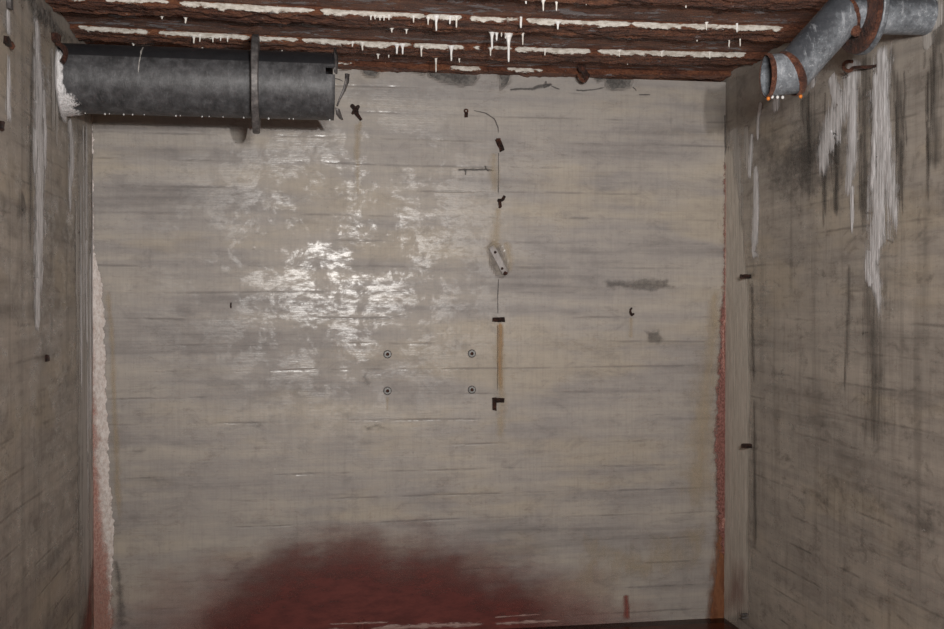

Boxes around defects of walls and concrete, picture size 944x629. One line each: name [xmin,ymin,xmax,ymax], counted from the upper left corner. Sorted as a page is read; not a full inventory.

water stain [78,25,480,51]
water stain [106,0,783,32]
water stain [493,46,746,58]
water stain [923,0,942,50]
water stain [800,60,859,233]
water stain [865,47,898,309]
water stain [33,13,115,629]
rust [709,165,726,623]
rust [177,544,606,629]